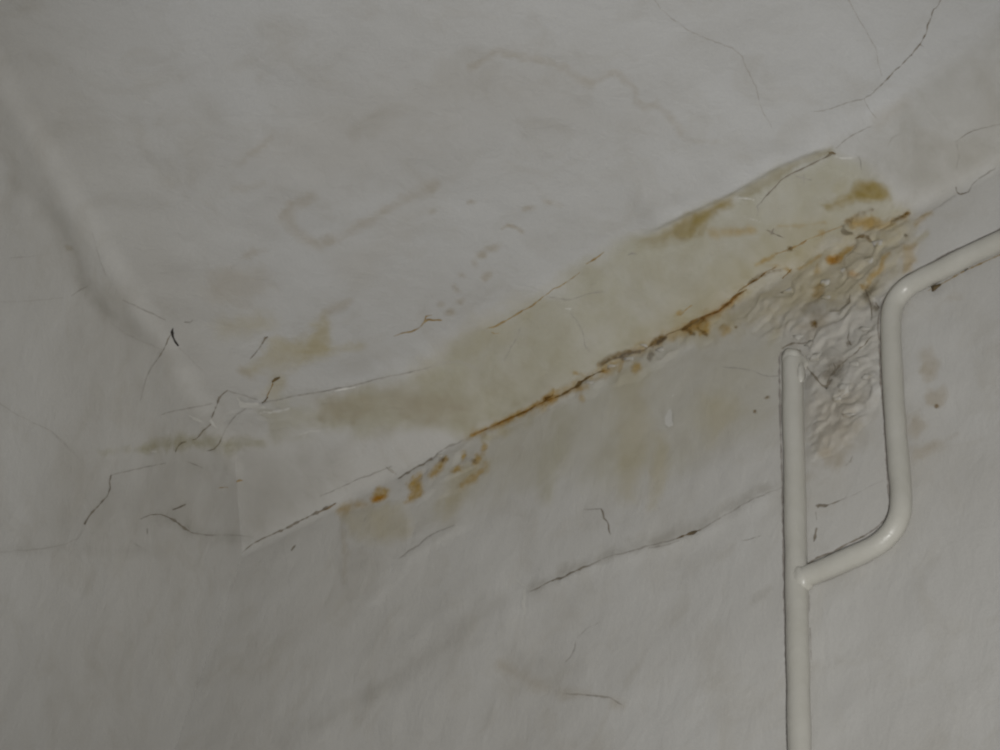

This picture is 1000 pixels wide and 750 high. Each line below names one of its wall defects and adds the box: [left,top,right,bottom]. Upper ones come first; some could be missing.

crack [908,124,1000,223]
crack [104,300,202,402]
crack [141,0,941,553]
crack [7,361,478,552]
crack [530,228,1000,750]